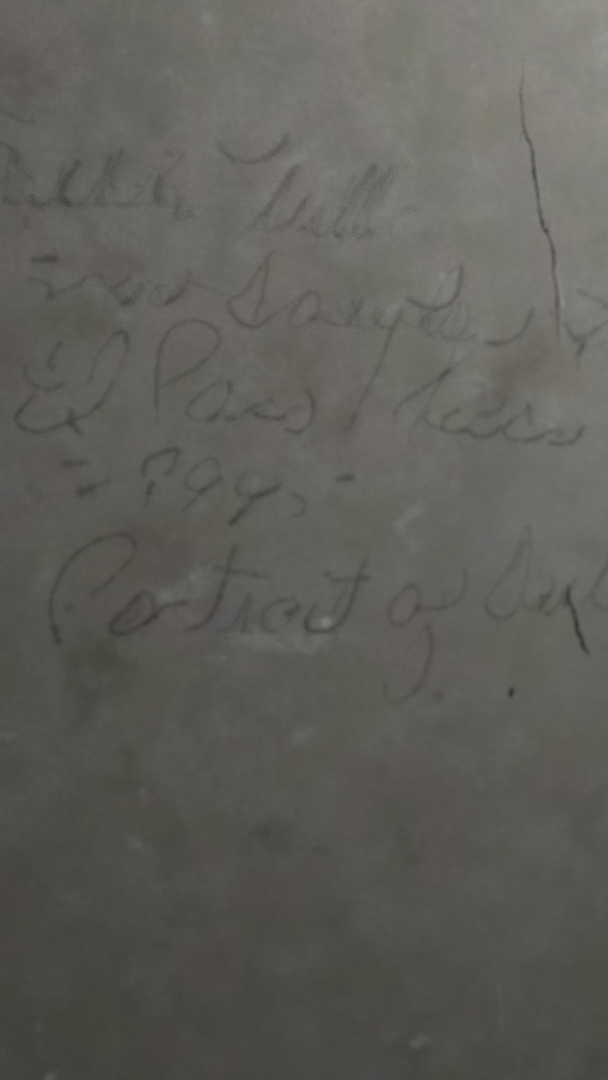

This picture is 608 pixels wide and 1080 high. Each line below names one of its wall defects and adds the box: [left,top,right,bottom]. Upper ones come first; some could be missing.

crack [521,97,564,309]
crack [567,589,589,653]